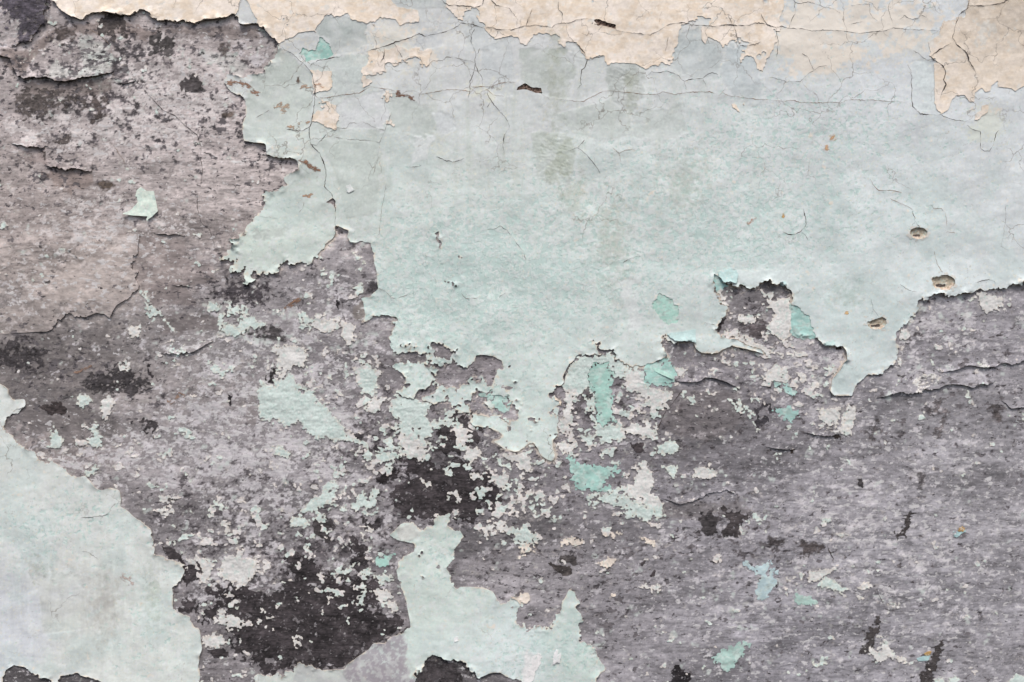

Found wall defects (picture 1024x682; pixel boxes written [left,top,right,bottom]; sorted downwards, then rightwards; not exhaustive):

crack [286,50,391,235]
spalling [517,83,542,94]
peeling [446,0,785,71]
crack [369,0,1007,151]
peeling [929,0,1024,120]
crack [872,183,955,270]
peeling [0,0,503,682]
peeling [331,268,1024,682]